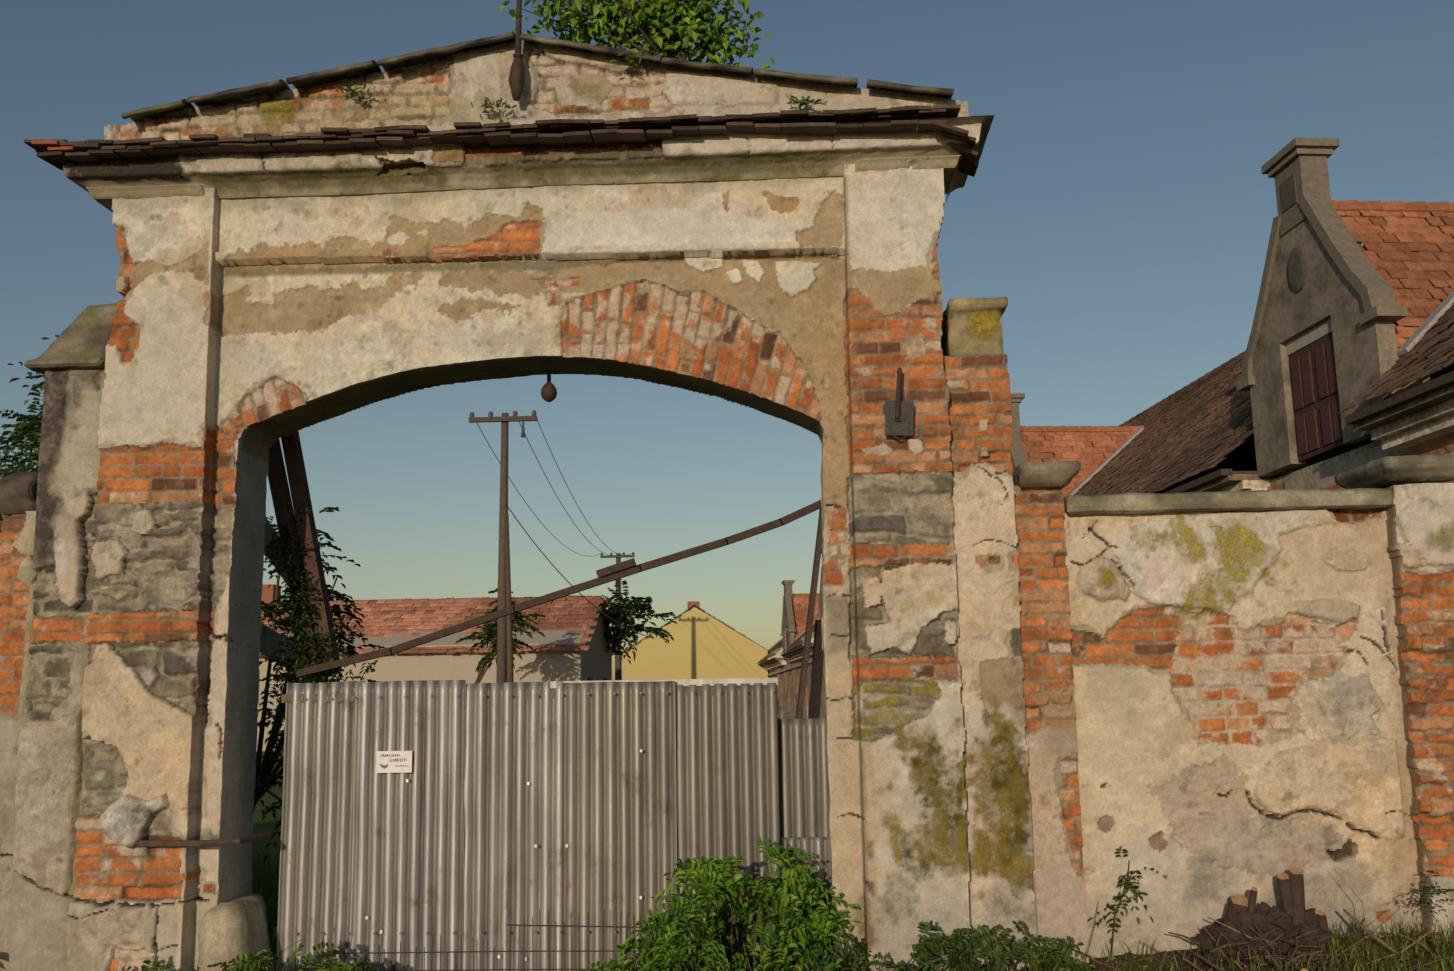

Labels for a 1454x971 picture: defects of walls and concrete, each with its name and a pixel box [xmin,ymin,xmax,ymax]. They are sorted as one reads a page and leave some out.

flaking render [0,375,309,723]
spalling [107,190,1361,901]
spalling [1330,508,1384,524]
spalling [1399,570,1454,877]
crack [0,852,205,950]
spalling [74,736,216,901]
leakage [885,815,927,865]
crack [1217,789,1410,838]